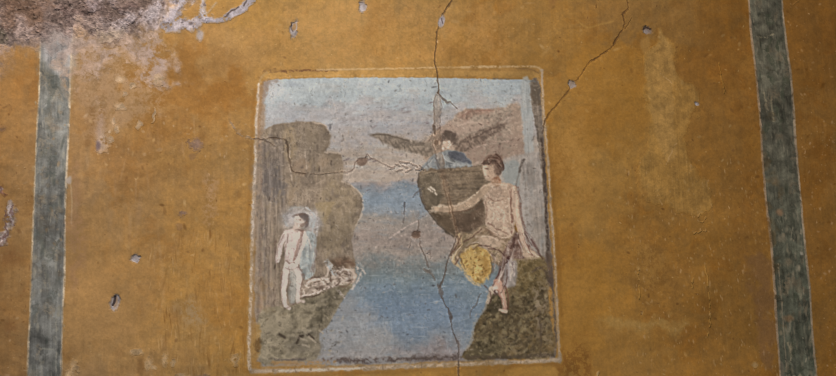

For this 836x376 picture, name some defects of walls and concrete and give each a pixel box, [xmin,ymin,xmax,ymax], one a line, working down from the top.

crack [541,0,632,134]
peeling [0,186,19,247]
crack [229,0,482,376]
flaking render [108,293,122,312]